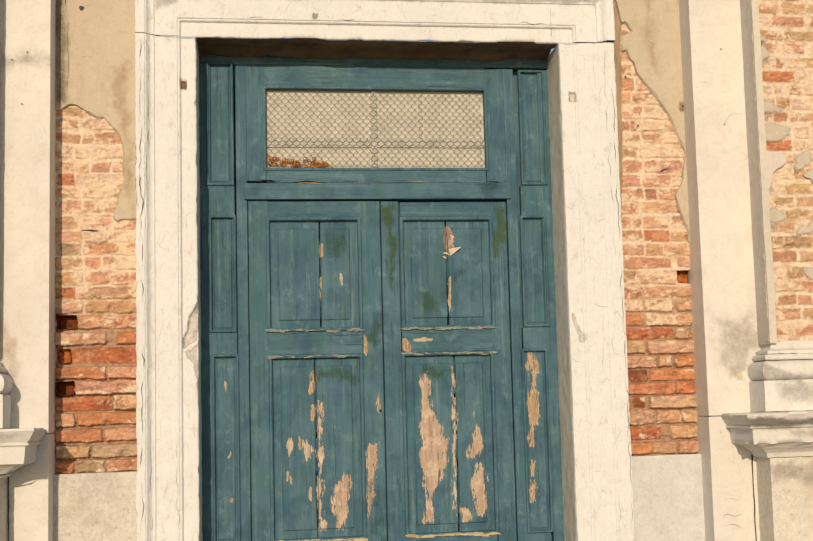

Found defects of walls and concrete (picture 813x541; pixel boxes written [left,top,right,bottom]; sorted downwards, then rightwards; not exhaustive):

flaking render [52,104,137,474]
peeling [286,373,352,532]
peeling [365,443,380,517]
peeling [402,337,433,352]
peeling [443,226,461,259]
peeling [419,367,489,525]
peeling [525,352,540,448]
peeling [529,460,540,503]
flaking render [614,0,699,456]
flaking render [758,0,813,341]